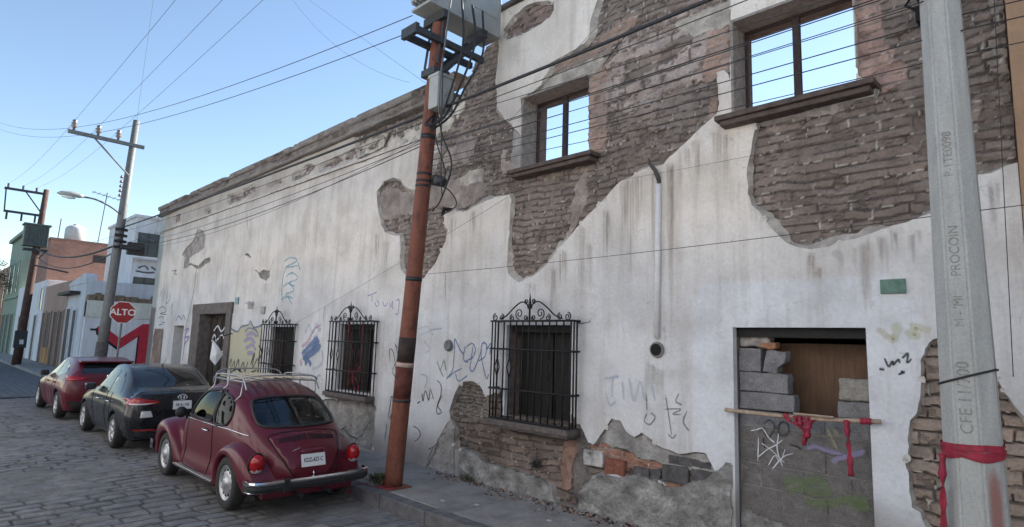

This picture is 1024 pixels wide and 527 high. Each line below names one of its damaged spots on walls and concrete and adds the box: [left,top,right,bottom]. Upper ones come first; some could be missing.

spalling [182,228,211,269]
spalling [227,111,423,205]
spalling [377,178,415,275]
spalling [422,0,732,282]
spalling [747,0,930,249]
spalling [961,0,1017,175]
spalling [426,381,715,507]
spalling [902,338,947,527]
spalling [996,366,1024,527]